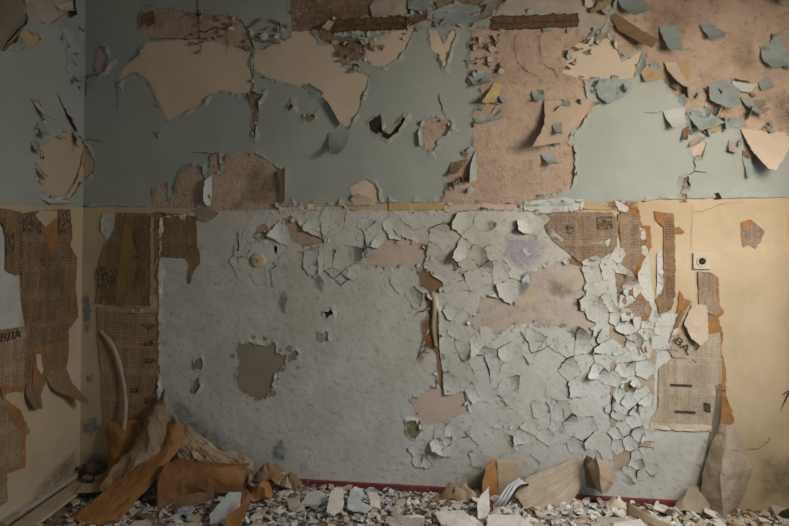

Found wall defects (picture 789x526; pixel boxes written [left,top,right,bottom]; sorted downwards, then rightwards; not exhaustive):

peeling [0,0,42,52]
crack [152,0,228,55]
peeling [30,98,95,204]
peeling [101,213,116,241]
flaking render [118,0,789,485]